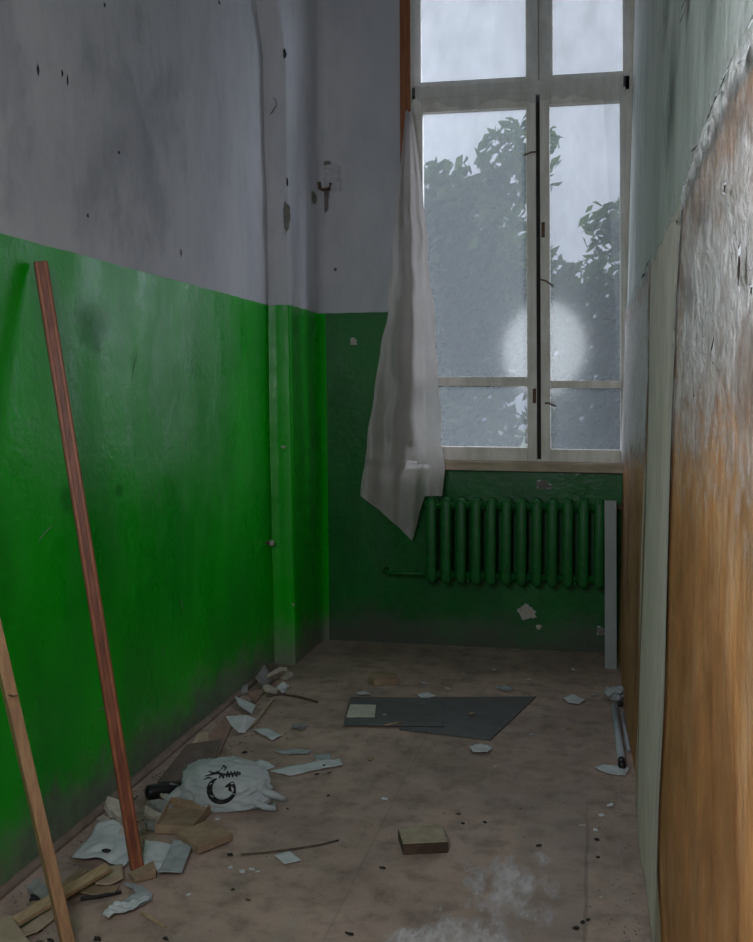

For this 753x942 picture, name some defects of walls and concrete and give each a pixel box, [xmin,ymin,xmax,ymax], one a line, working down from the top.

crack [704,15,753,125]
spalling [517,603,542,630]